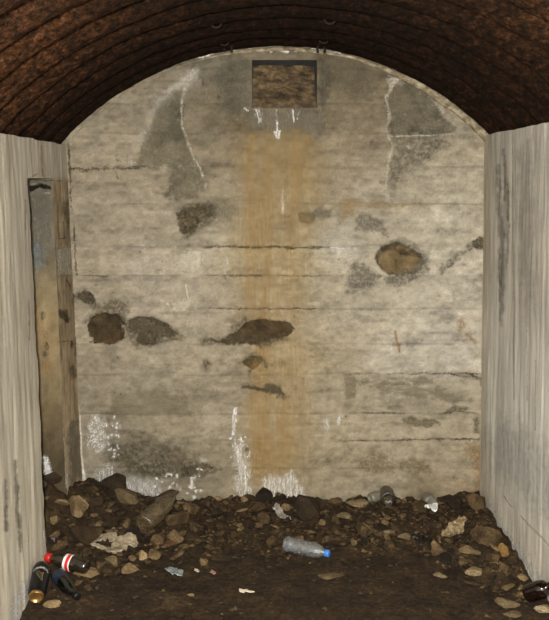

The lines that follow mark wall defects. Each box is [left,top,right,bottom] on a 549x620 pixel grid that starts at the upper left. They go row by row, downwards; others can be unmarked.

crack [68,144,145,208]
spalling [177,204,216,238]
spalling [374,240,430,280]
spalling [73,290,182,346]
spalling [203,318,295,347]
spalling [243,353,267,372]
spalling [242,384,285,397]
water stain [63,393,214,498]
efflorescence [229,408,251,496]
efflorescence [264,471,303,497]